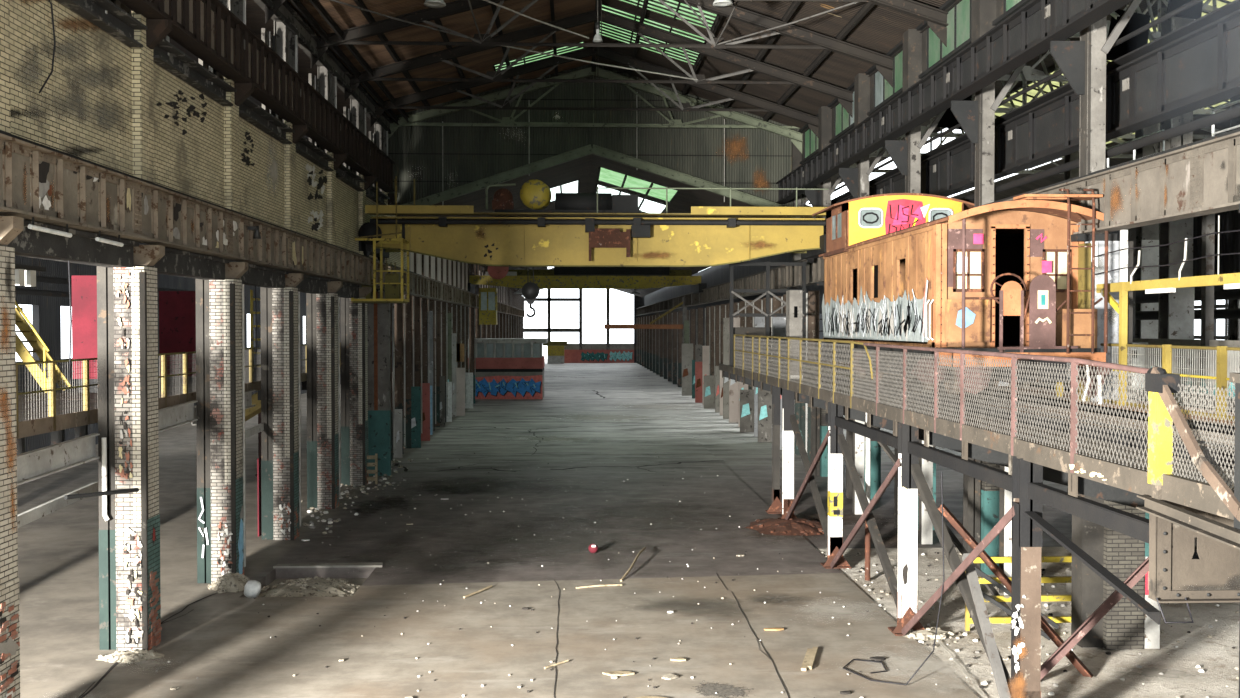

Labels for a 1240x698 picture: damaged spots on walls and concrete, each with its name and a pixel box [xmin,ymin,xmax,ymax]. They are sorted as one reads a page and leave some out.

spalling [116,273,133,479]
spalling [0,602,20,698]
peeling [123,527,162,649]
crack [716,573,790,698]
rust [1011,677,1024,698]